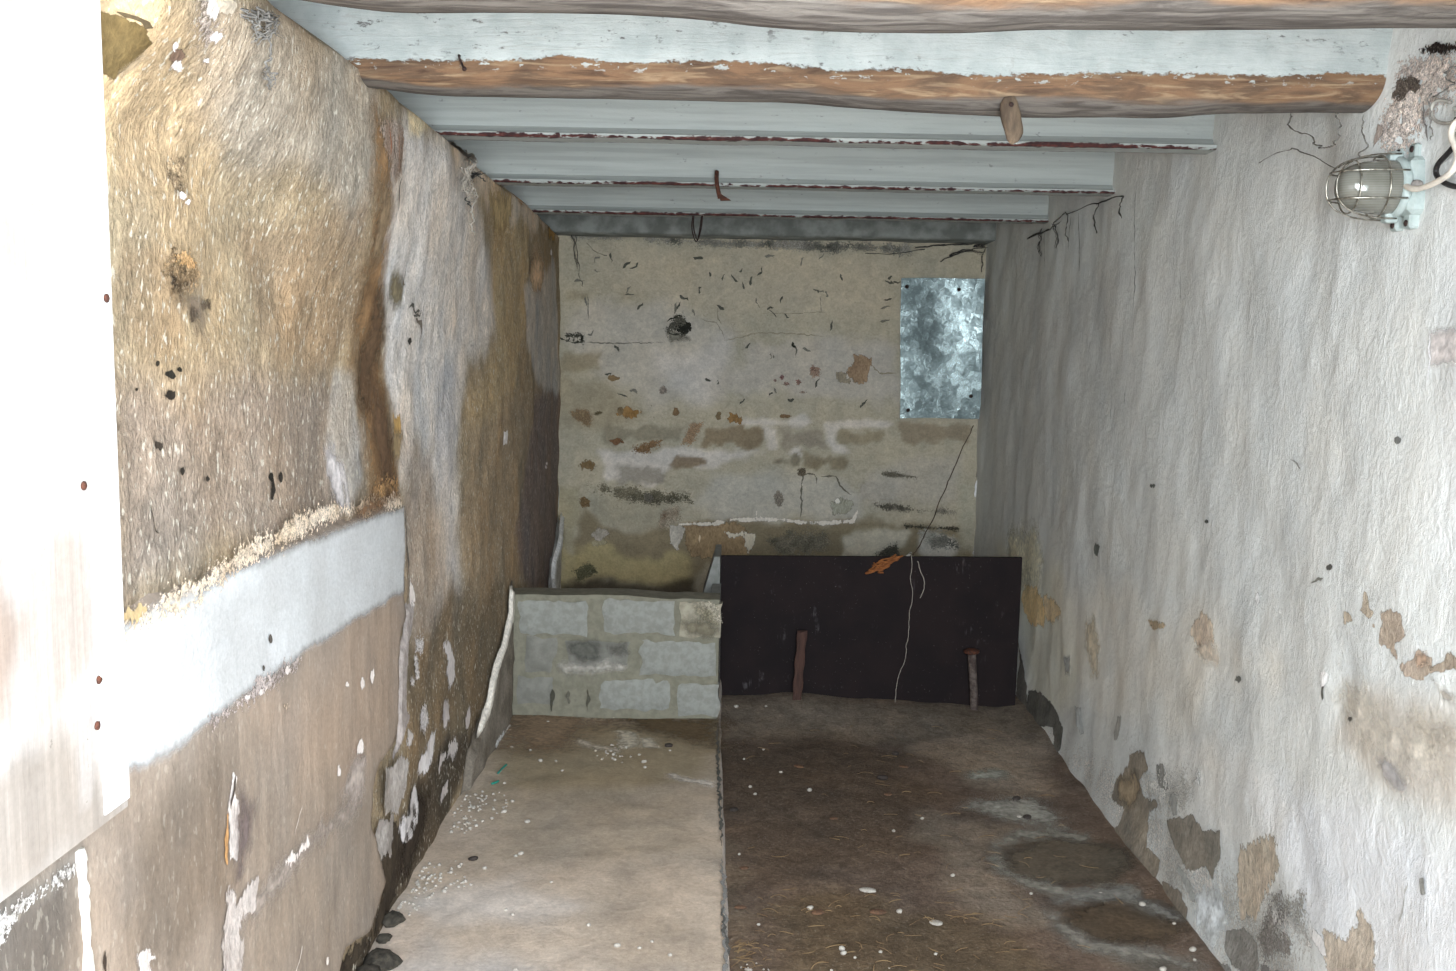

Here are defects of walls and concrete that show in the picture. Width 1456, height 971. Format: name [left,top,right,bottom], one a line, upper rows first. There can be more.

peeling [100,11,154,80]
spalling [170,0,237,72]
spalling [1373,42,1456,155]
water stain [352,112,406,507]
peeling [836,354,893,385]
peeling [590,482,858,559]
peeling [1008,532,1061,627]
peeling [1148,619,1166,630]
peeling [1191,611,1219,662]
peeling [1343,592,1456,680]
spalling [375,602,414,861]
peeling [1016,643,1376,971]